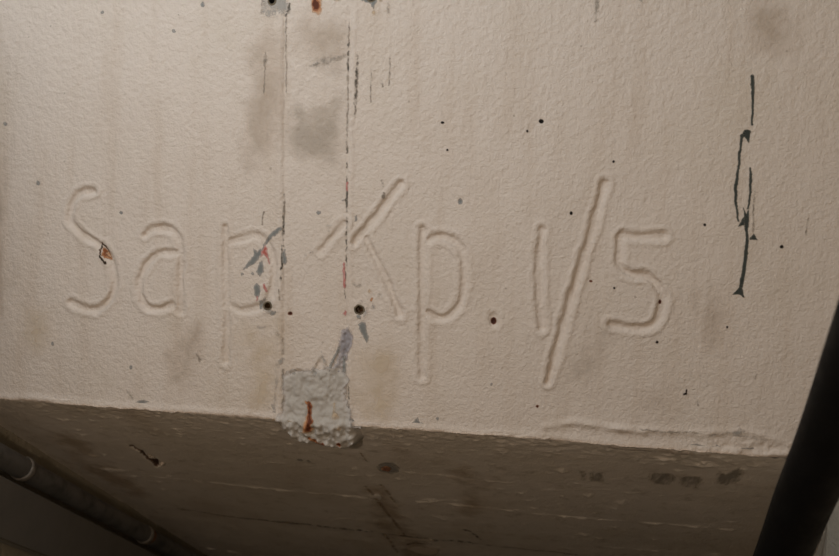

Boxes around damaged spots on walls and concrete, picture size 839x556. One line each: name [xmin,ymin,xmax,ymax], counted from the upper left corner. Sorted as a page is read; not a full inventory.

corrosion [311,0,322,14]
spalling [272,291,374,448]